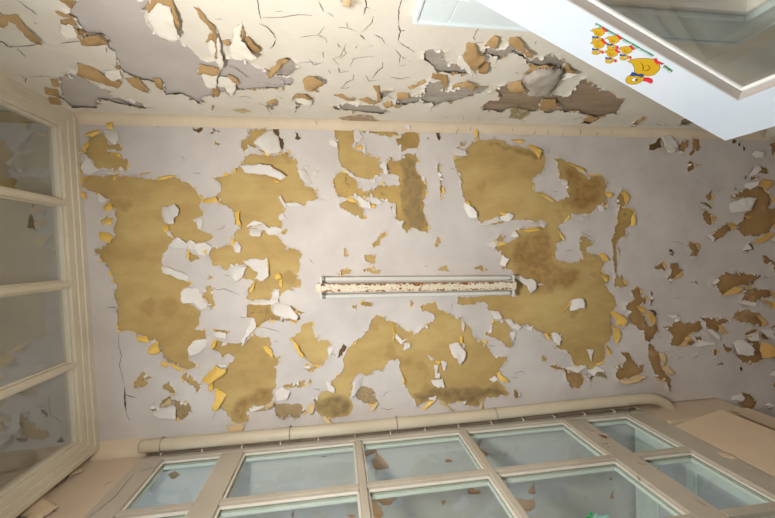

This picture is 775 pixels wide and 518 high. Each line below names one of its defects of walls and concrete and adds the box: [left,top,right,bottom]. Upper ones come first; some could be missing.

peeling [45,0,323,111]
crack [257,0,414,99]
peeling [332,35,625,123]
peeling [78,122,775,432]